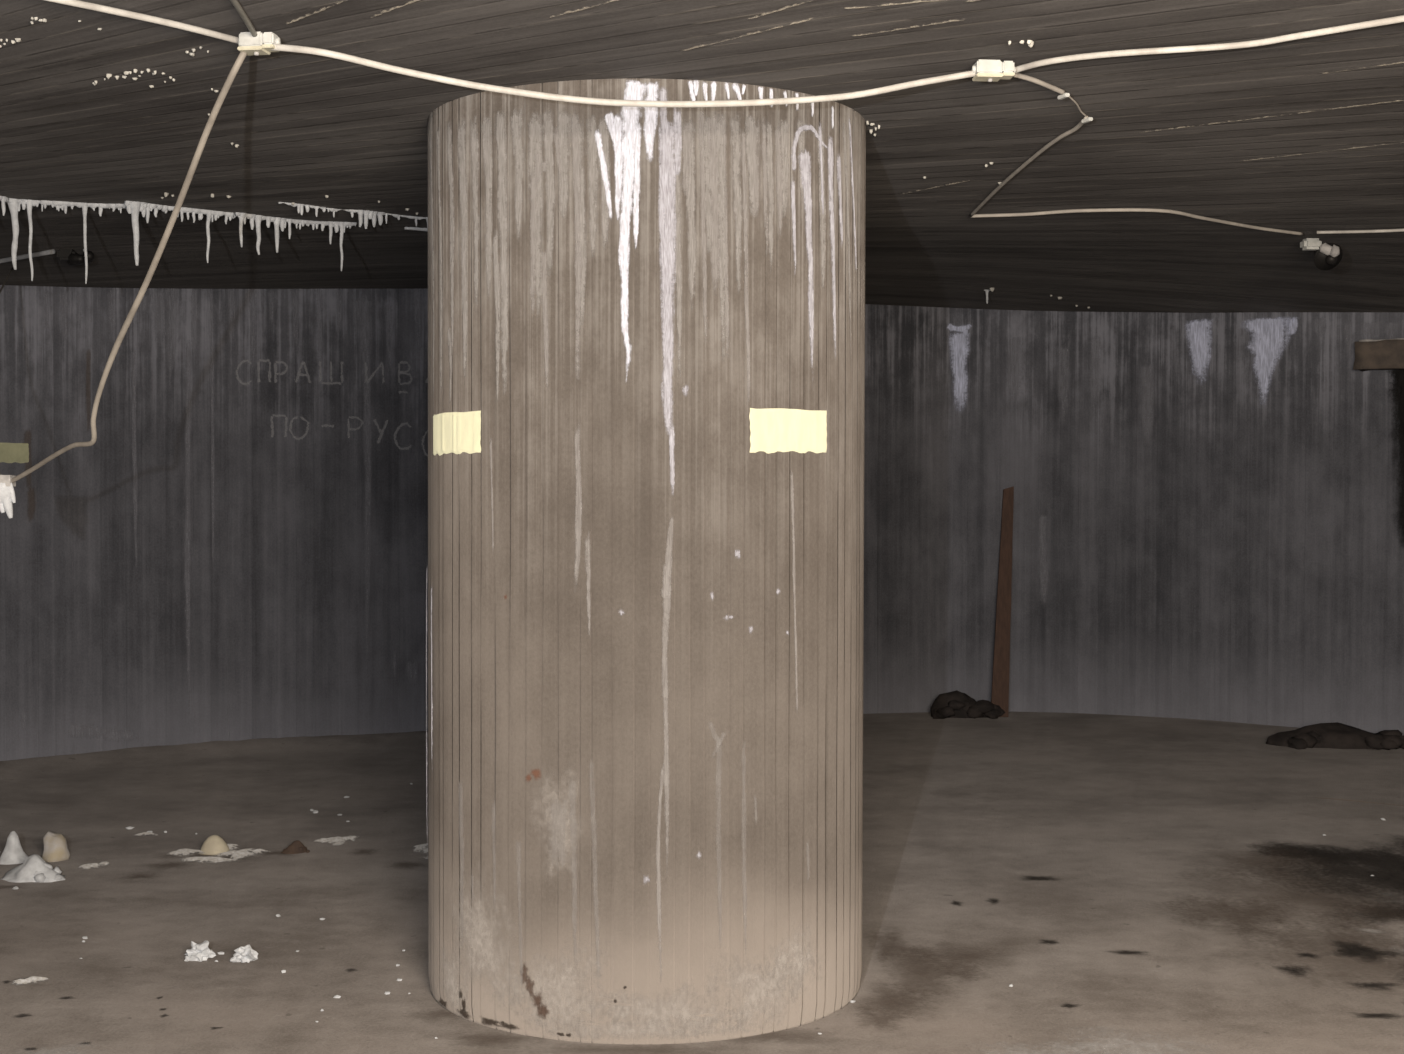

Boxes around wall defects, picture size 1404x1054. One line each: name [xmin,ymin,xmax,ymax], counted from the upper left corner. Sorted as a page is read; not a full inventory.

water stain [378,80,880,492]
efflorescence [1186,320,1212,382]
efflorescence [1245,317,1298,402]
efflorescence [575,430,591,633]
water stain [1391,369,1404,542]